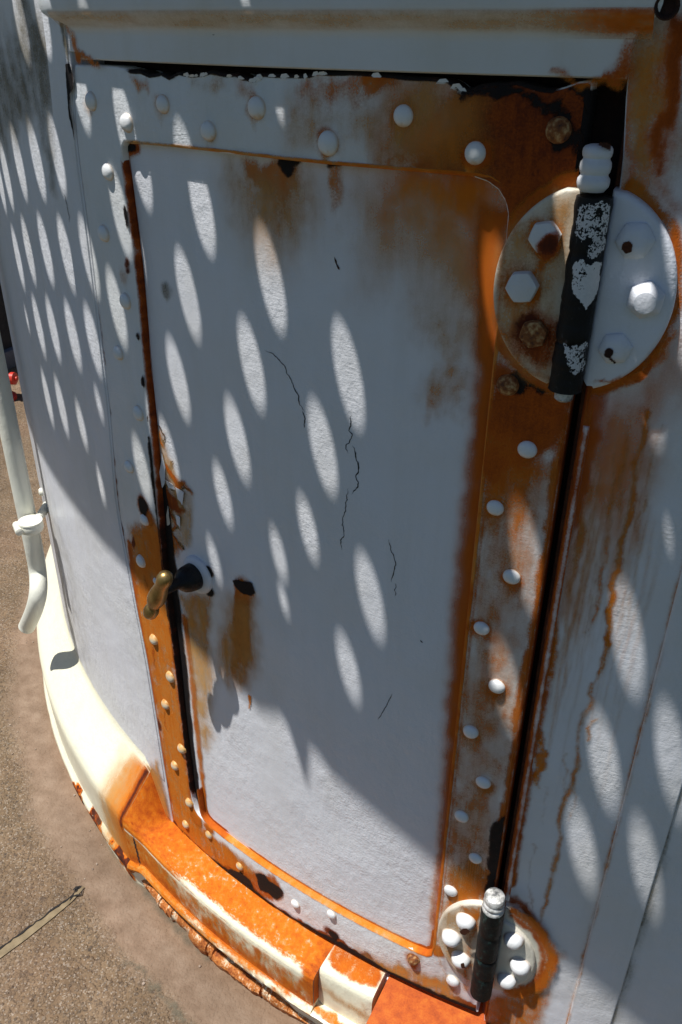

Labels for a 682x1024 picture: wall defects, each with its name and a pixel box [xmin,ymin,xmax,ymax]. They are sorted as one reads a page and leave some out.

peeling [571,201,611,309]
crack [266,351,305,427]
peeling [563,342,588,375]
crack [340,416,359,548]
corrosion [143,8,682,957]
corrosion [101,141,476,1012]
corrosion [313,1005,342,1024]
corrosion [484,897,559,1024]